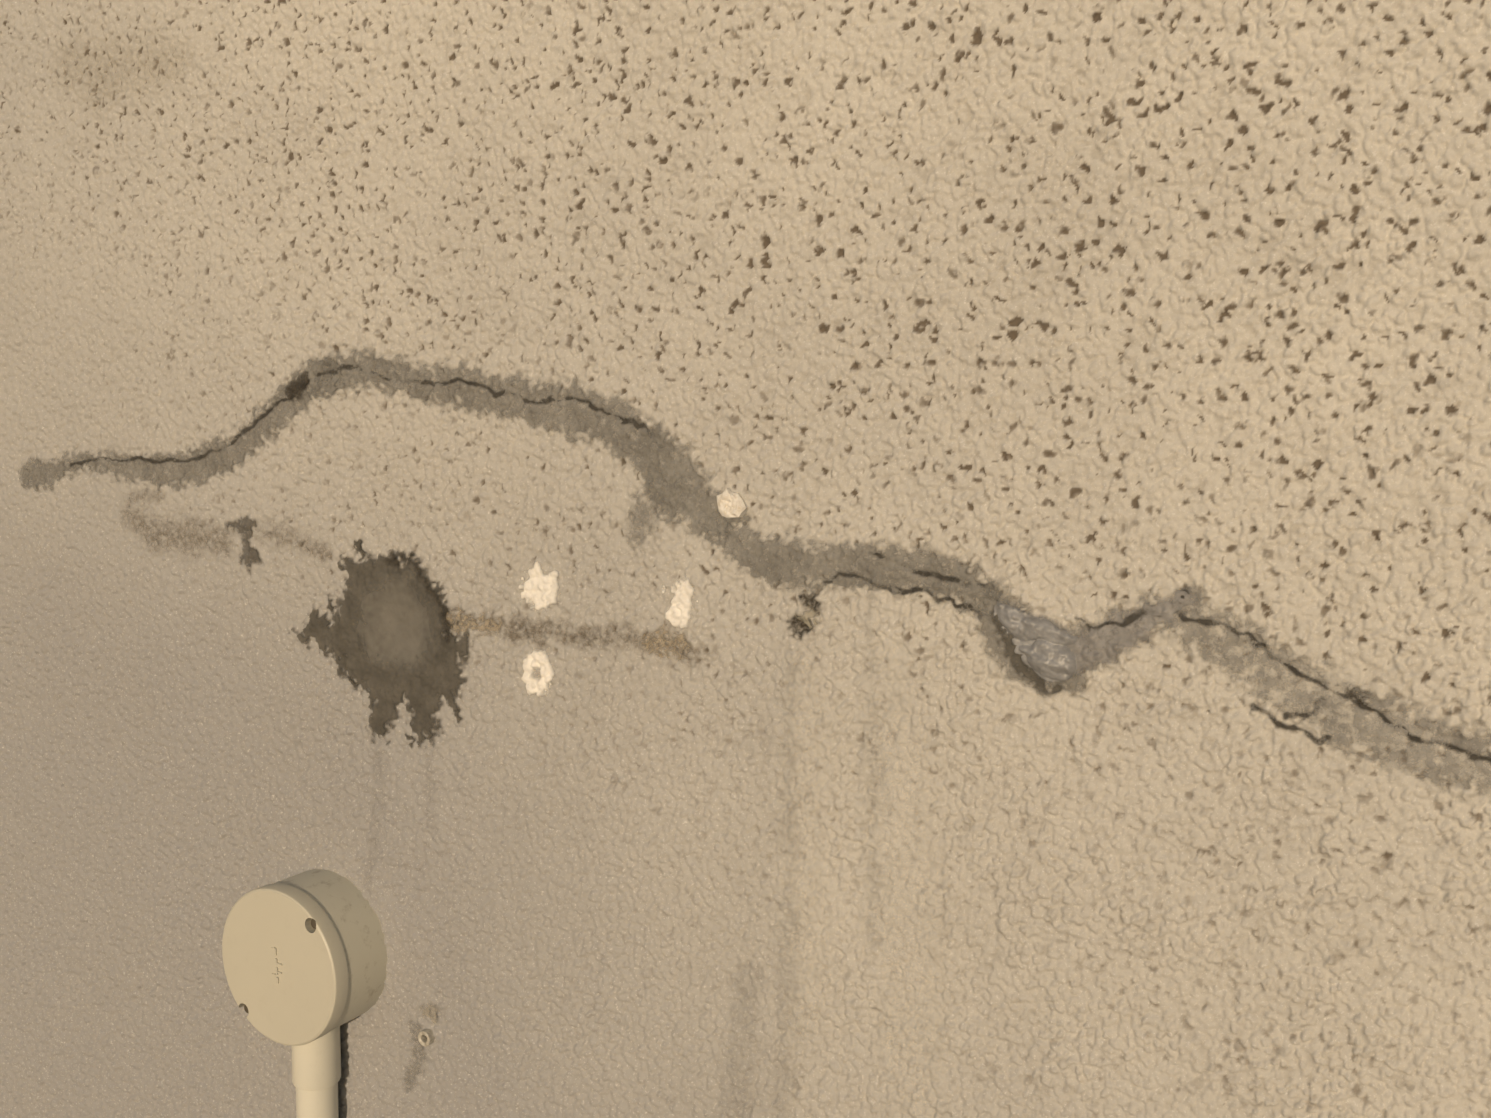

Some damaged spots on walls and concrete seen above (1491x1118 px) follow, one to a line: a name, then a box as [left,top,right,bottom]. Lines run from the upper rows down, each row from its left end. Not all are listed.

crack [20,349,1029,619]
crack [1072,587,1491,793]